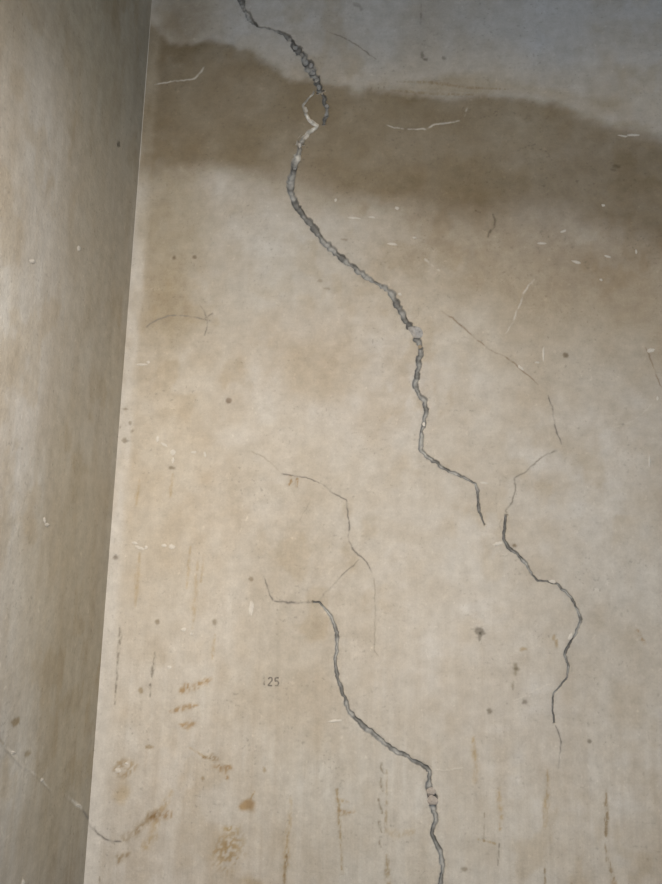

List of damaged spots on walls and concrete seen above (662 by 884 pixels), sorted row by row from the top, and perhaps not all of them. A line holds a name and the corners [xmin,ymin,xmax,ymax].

crack [145,303,214,336]
crack [154,66,206,86]
leakage [128,19,662,393]
crack [235,0,584,770]
crack [249,449,464,884]